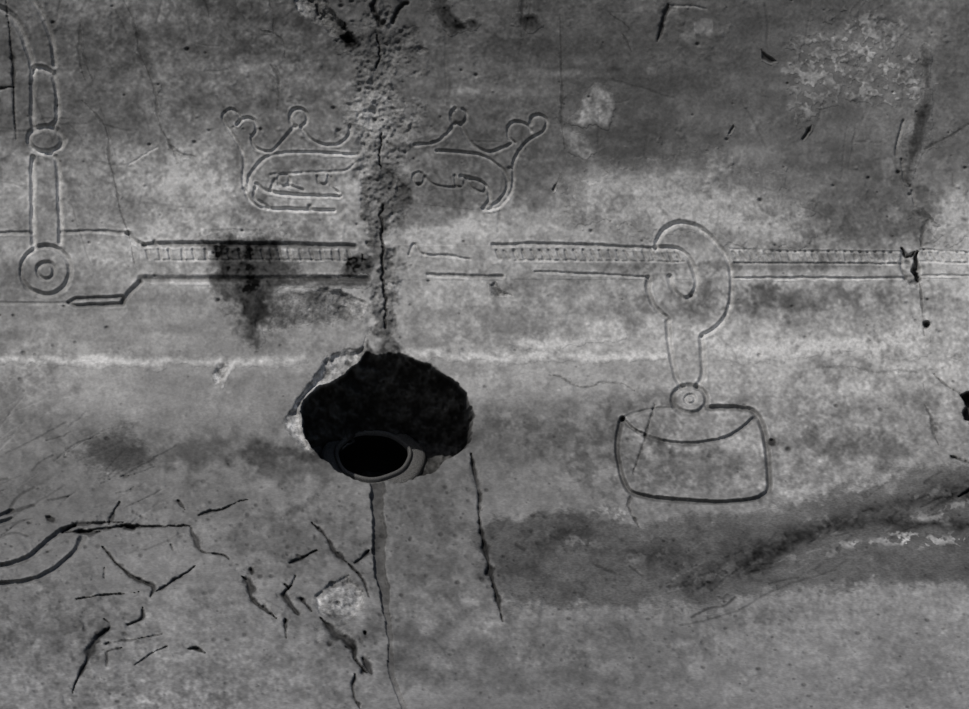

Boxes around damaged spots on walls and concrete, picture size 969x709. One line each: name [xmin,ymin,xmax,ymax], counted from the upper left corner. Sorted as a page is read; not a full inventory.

spalling [293,0,346,37]
crack [918,219,932,248]
damp [0,223,374,389]
crack [917,283,925,321]
crack [822,348,969,463]
crack [468,453,483,528]
crack [62,497,375,709]
crack [479,552,504,622]